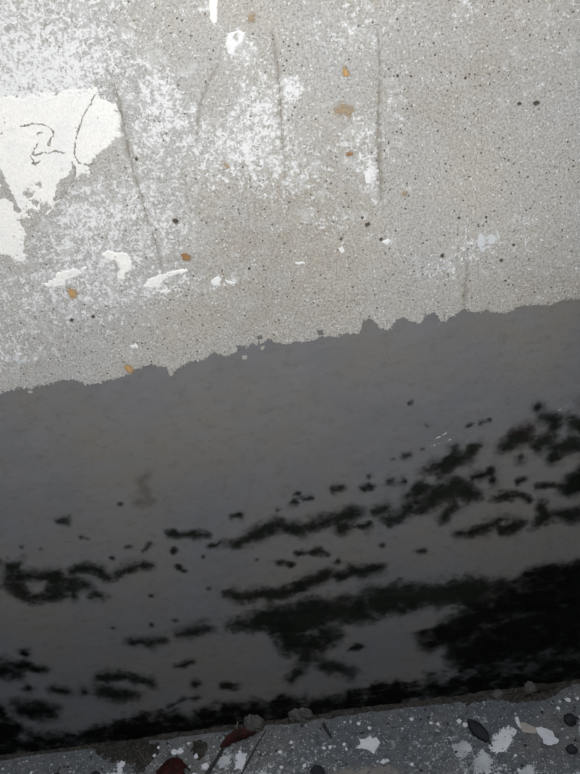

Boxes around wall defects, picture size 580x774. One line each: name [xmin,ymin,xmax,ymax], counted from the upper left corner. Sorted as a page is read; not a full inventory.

flaking render [0,87,121,262]
flaking render [44,266,87,288]
flaking render [101,250,132,280]